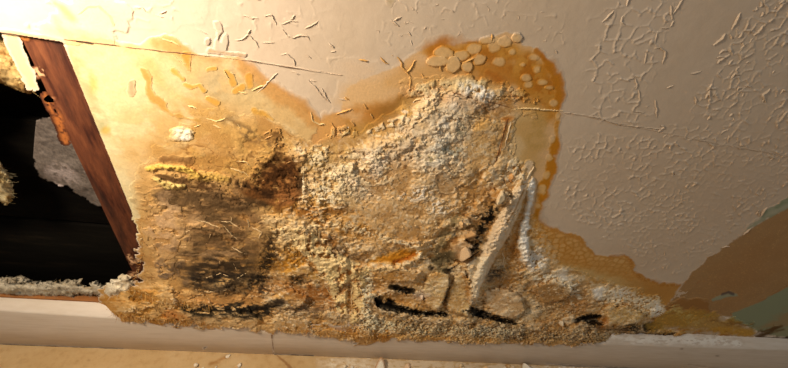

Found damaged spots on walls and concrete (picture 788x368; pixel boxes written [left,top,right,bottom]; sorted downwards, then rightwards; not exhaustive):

spalling [0,42,57,117]
crack [64,39,338,75]
water stain [0,0,471,322]
peeling [209,0,357,104]
flaking render [82,74,667,349]
water stain [328,31,788,348]
crack [452,92,788,163]
peeling [547,0,788,281]